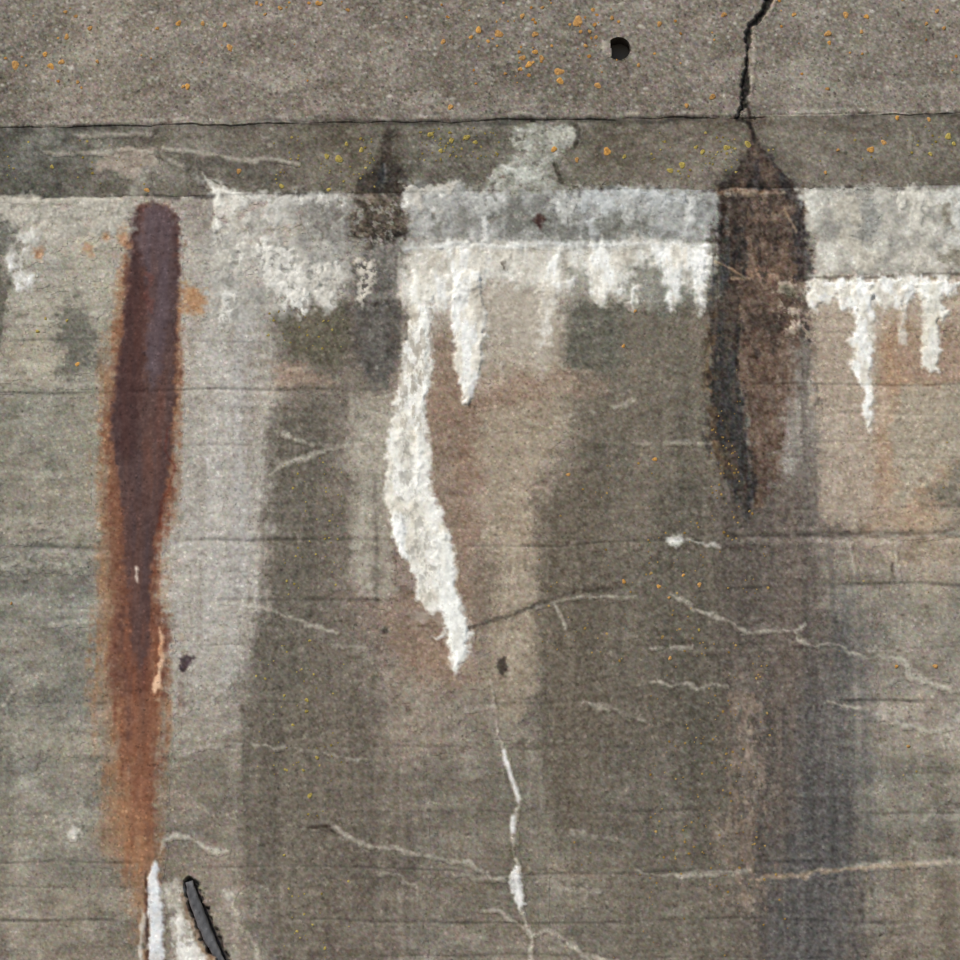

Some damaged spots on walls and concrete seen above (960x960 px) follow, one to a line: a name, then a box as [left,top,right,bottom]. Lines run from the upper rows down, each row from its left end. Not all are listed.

crack [735,0,777,145]
damp [0,189,144,354]
corrosion [80,198,208,960]
spalling [162,874,238,960]
crack [174,741,372,765]
crack [208,599,370,652]
crack [288,672,626,960]
damp [167,119,960,960]
crack [633,859,931,883]
crack [667,590,960,765]